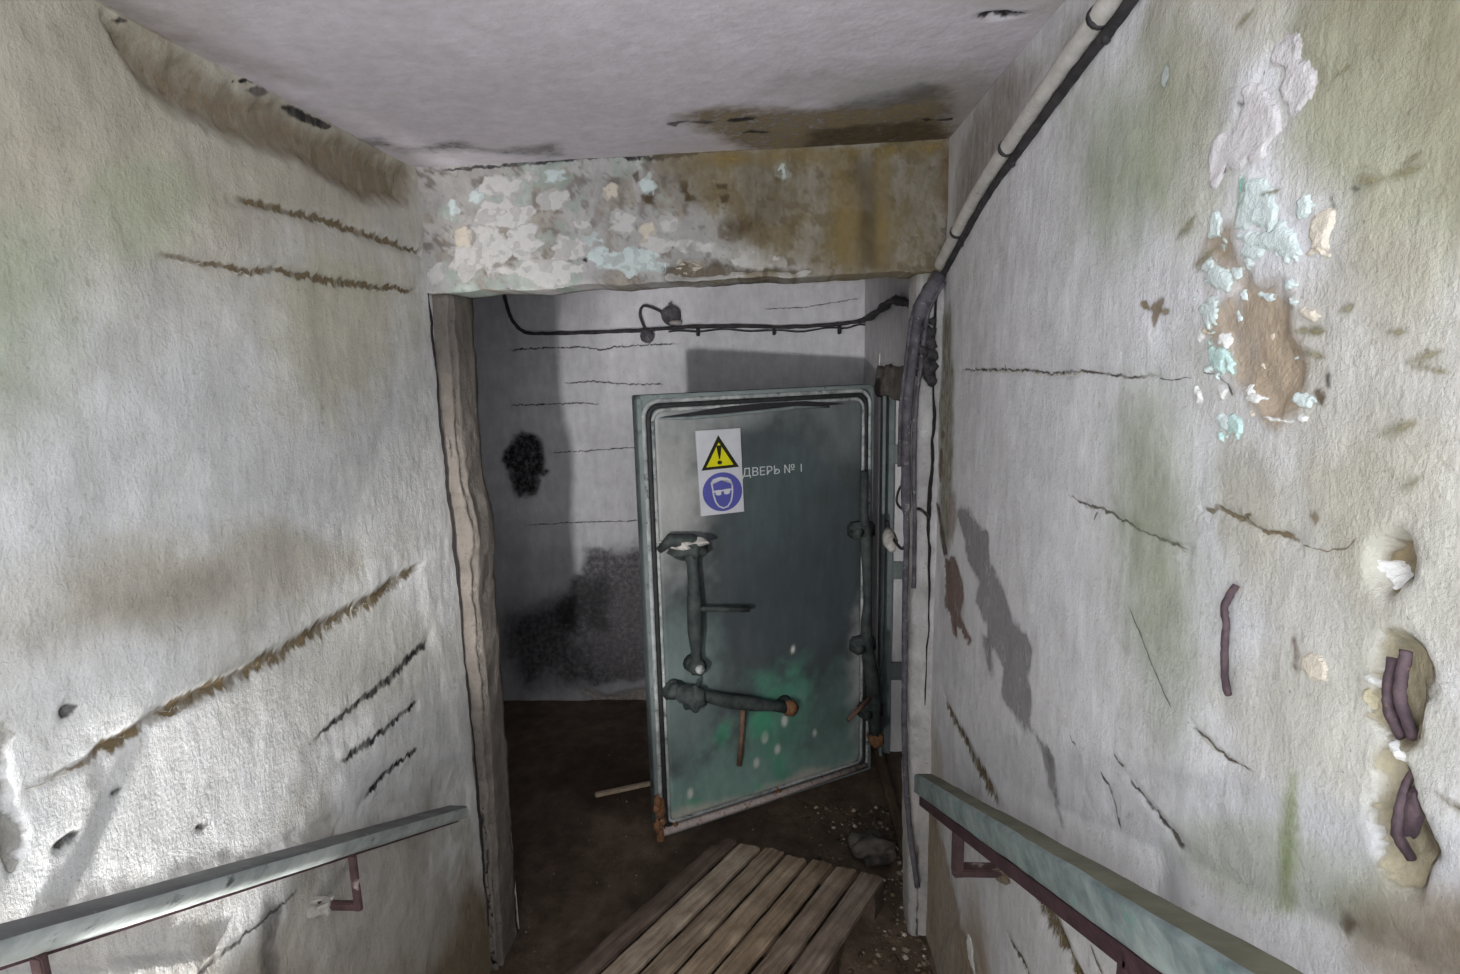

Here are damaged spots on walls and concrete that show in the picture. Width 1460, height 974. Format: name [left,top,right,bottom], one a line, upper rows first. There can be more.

crack [241,198,416,254]
peeling [427,168,798,289]
peeling [774,161,792,182]
leakage [684,89,955,263]
peeling [1185,32,1336,442]
crack [25,252,489,927]
leakage [939,316,1054,792]
crack [924,366,1233,806]
crack [1206,506,1355,552]
crack [1101,754,1184,848]
flaking render [1362,630,1441,889]
crack [1039,901,1103,974]